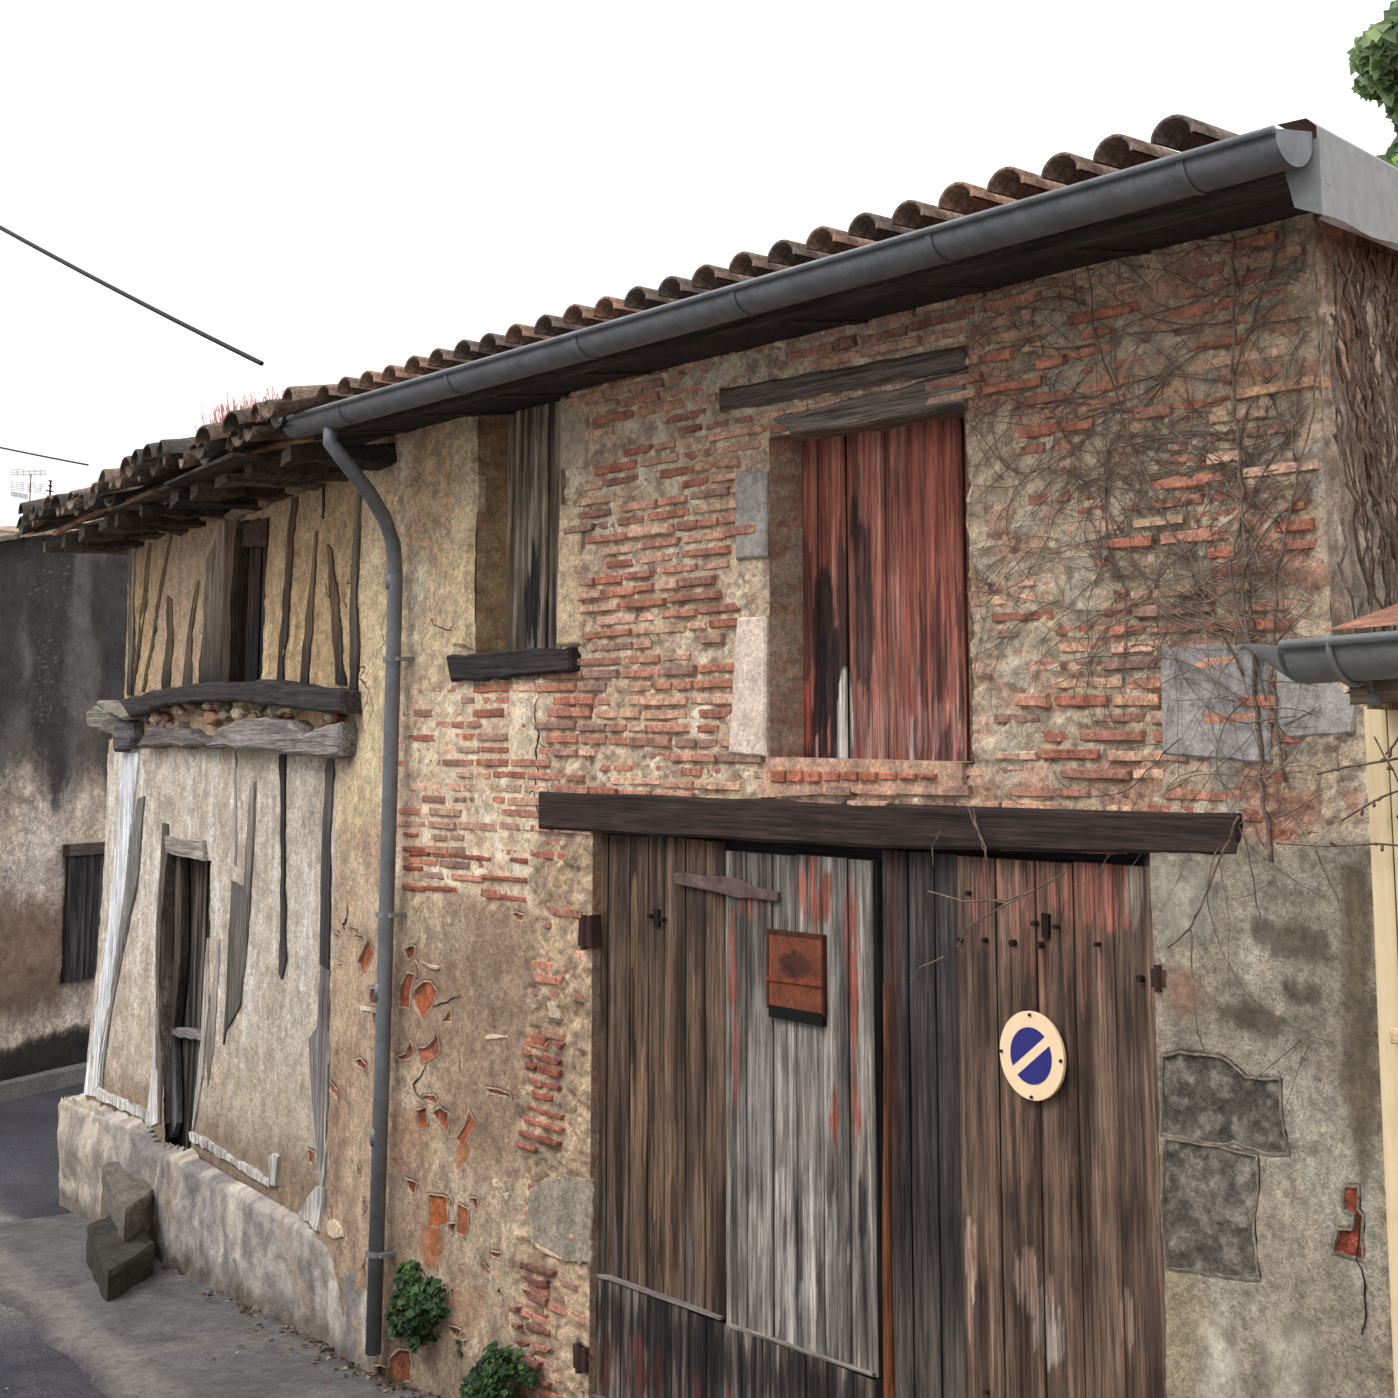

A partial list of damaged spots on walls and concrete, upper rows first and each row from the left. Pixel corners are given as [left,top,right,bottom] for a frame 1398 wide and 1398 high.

damp [0,530,129,809]
damp [0,892,62,1018]
flaking render [334,925,376,1029]
flaking render [395,944,453,1066]
peeling [531,1002,563,1019]
flaking render [354,1057,368,1079]
flaking render [415,1093,477,1147]
flaking render [1331,1184,1365,1264]